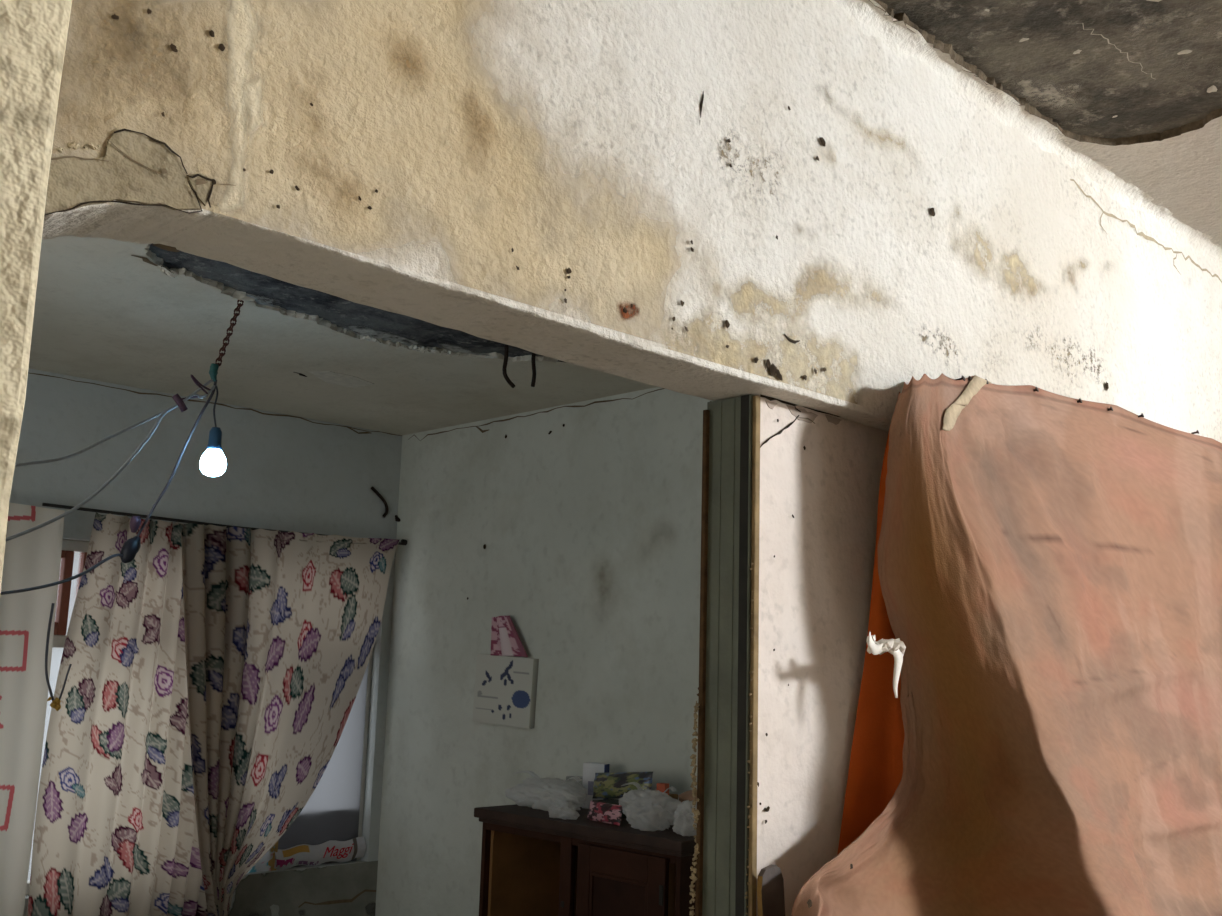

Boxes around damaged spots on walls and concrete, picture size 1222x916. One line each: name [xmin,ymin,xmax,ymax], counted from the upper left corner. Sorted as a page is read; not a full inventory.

flaking render [869,0,1222,146]
water stain [51,0,679,338]
water stain [719,140,779,200]
crack [1070,179,1222,283]
flaking render [131,243,567,363]
corrosion [619,303,639,319]
water stain [732,270,845,316]
water stain [669,319,857,404]
peeling [229,861,378,916]